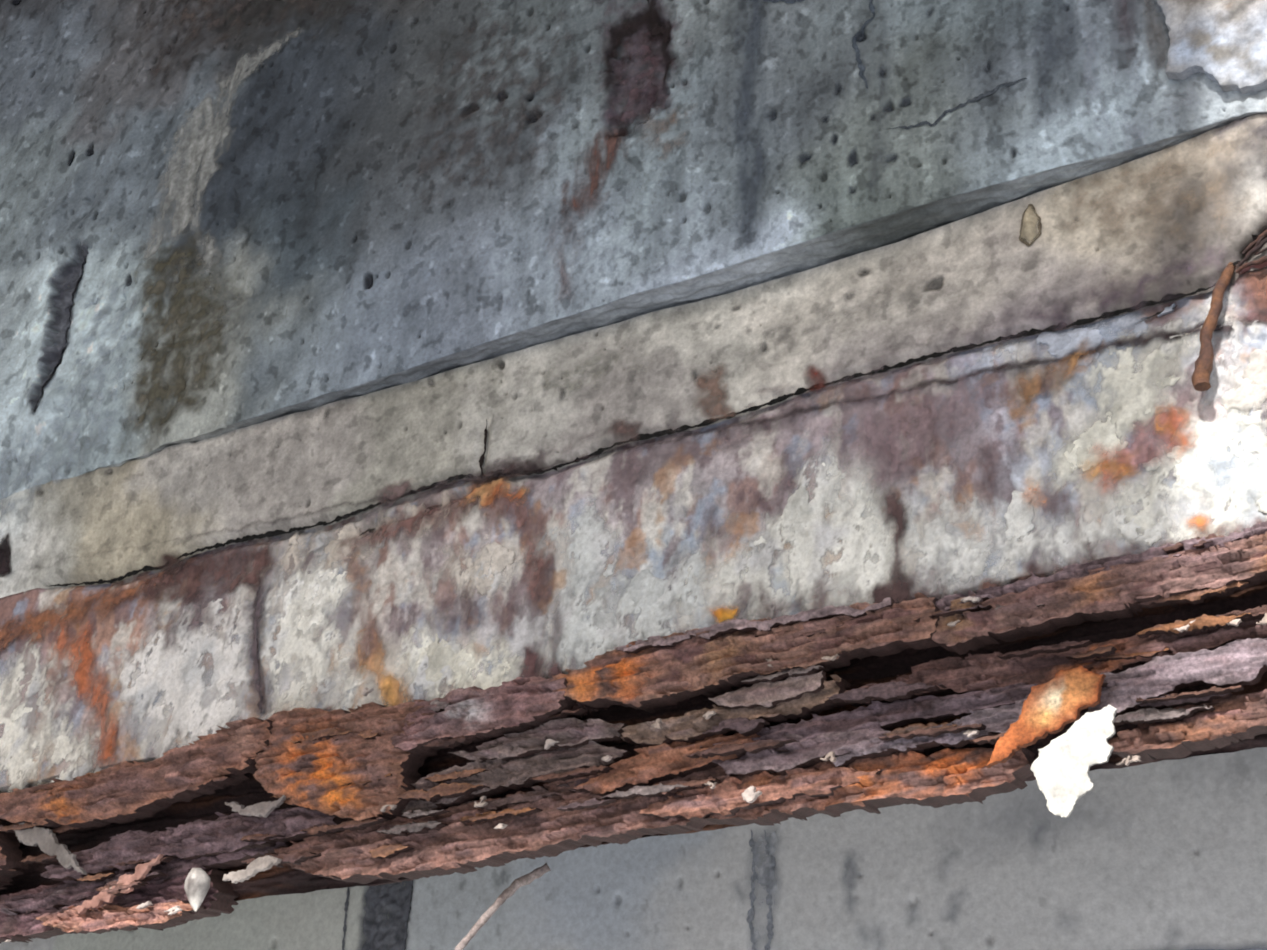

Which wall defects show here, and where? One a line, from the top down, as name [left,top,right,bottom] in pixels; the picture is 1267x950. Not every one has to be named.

rust [563,131,622,211]
crack [852,0,875,89]
crack [889,78,1027,129]
flaking render [1157,0,1267,94]
spalling [28,244,89,412]
damp [129,239,229,430]
crack [49,234,1267,587]
rust [1093,408,1184,486]
rust [354,460,549,600]
peeling [102,294,1267,758]
rust [0,488,1267,944]
peeling [1031,705,1141,818]